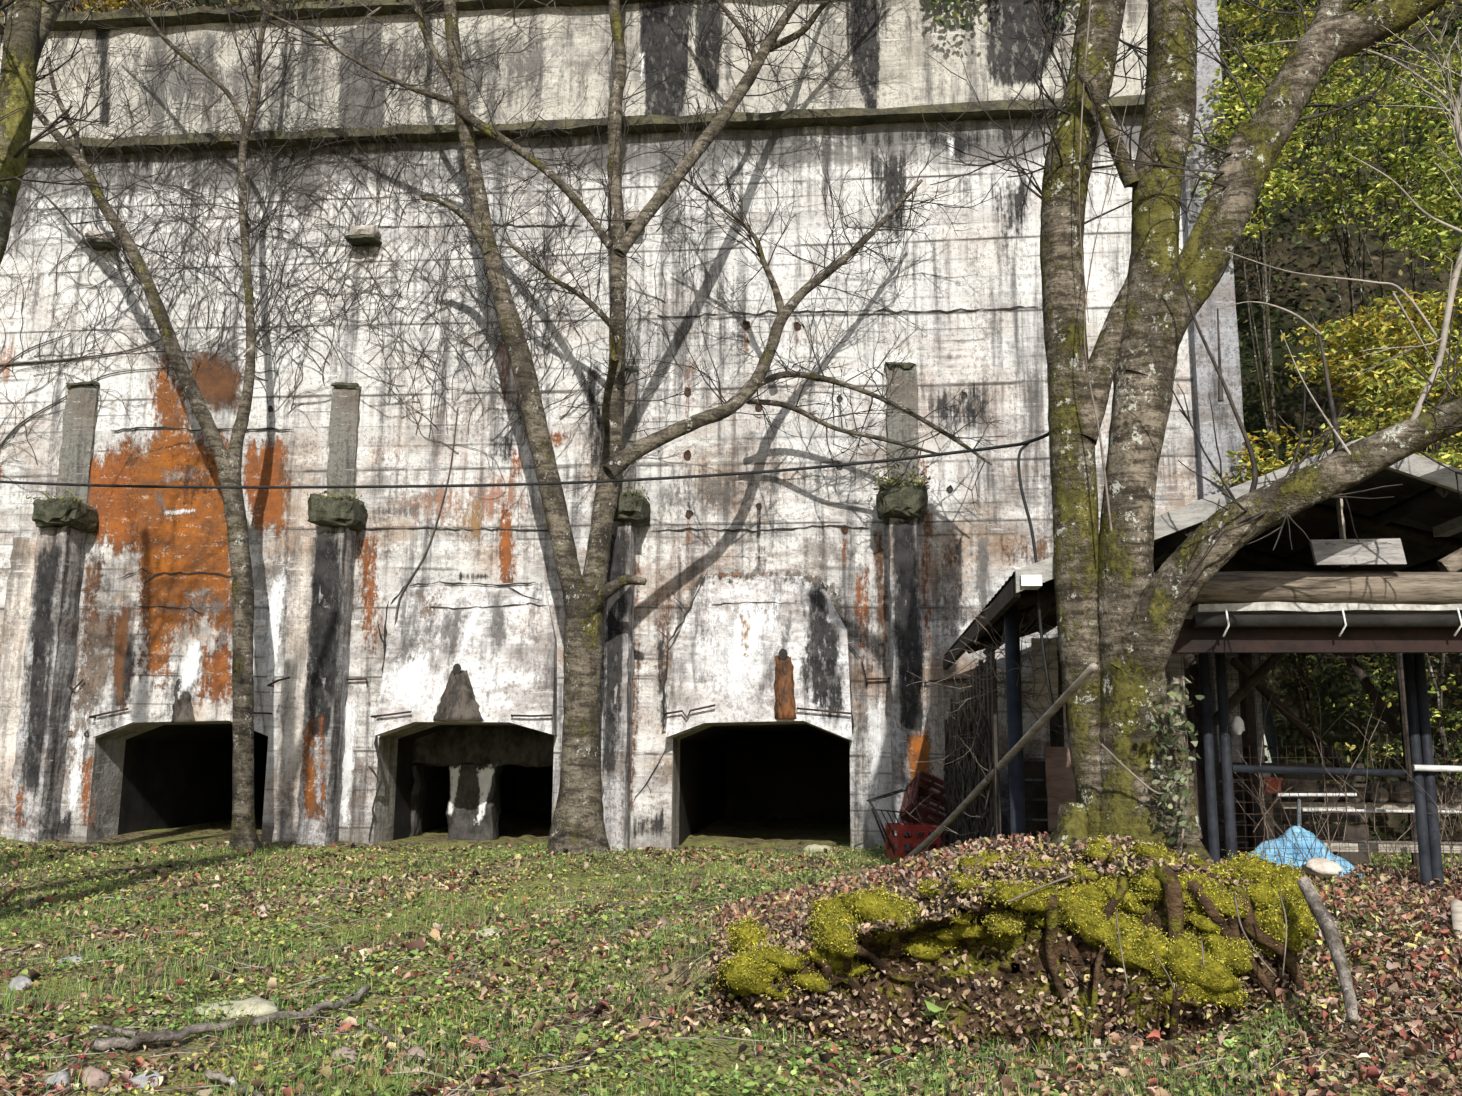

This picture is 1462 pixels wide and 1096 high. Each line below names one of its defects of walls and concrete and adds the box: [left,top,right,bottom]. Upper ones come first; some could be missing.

water stain [639,0,723,116]
water stain [846,0,880,108]
water stain [985,0,1069,100]
rust [550,431,565,447]
rust [80,351,291,709]
rust [400,449,528,583]
water stain [701,587,845,719]
rust [906,728,933,796]